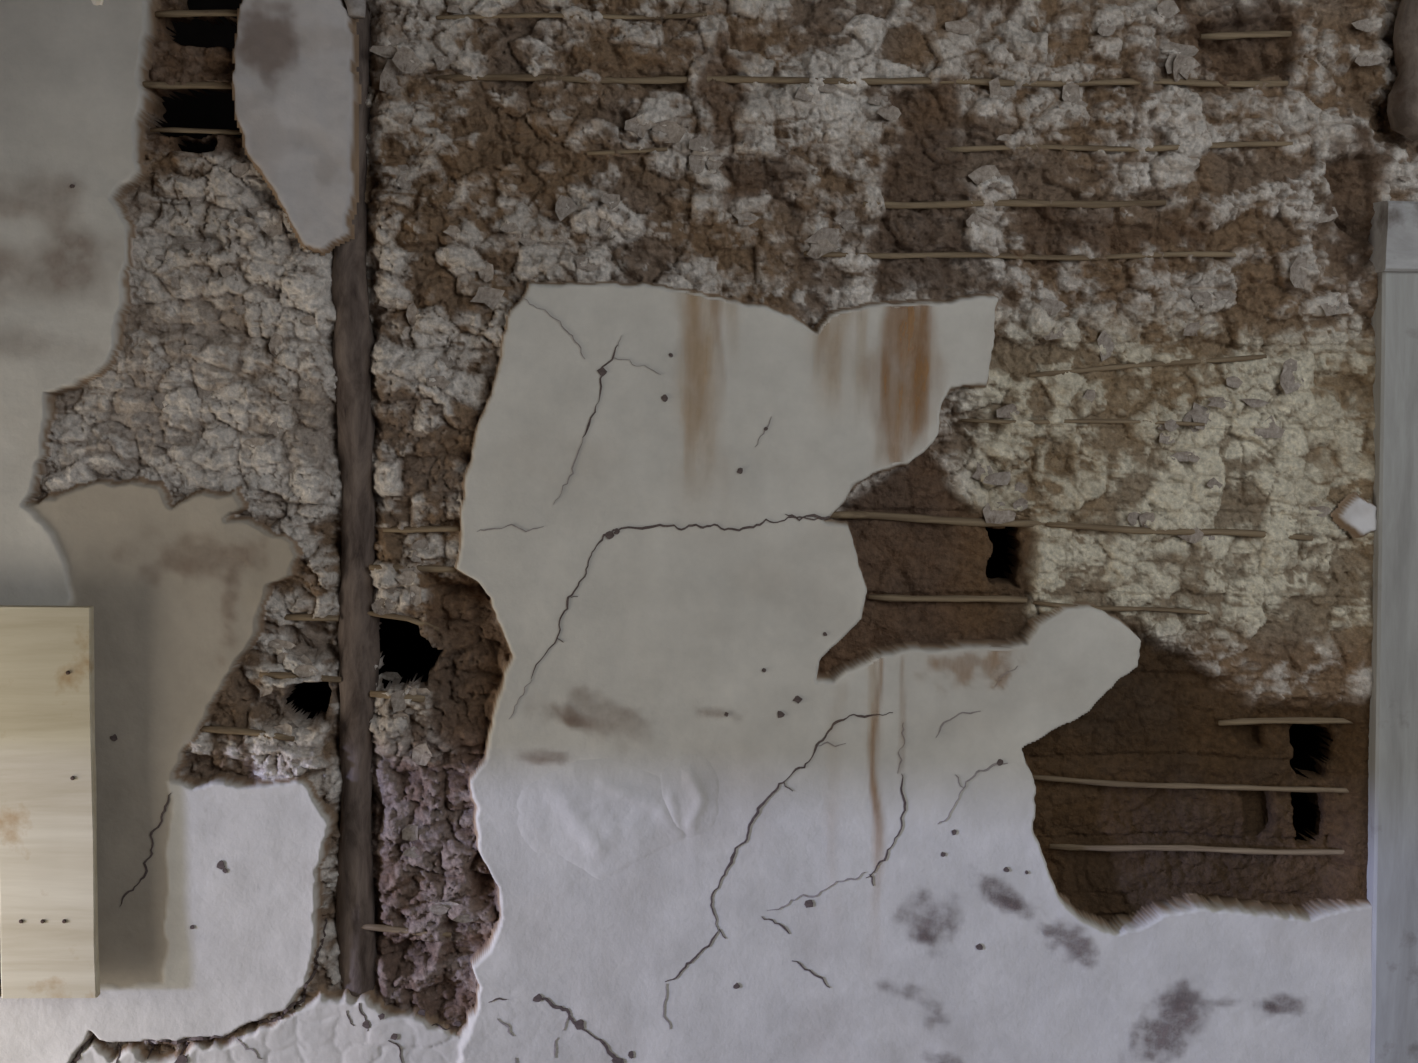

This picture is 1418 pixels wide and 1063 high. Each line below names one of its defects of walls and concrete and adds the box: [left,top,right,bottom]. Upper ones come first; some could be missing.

spalling [35,0,362,1006]
crack [477,298,673,532]
crack [509,514,831,719]
crack [737,417,772,474]
spalling [362,0,1418,1032]
crack [663,666,1018,1025]
water stain [984,881,1021,909]
spalling [142,1038,213,1055]